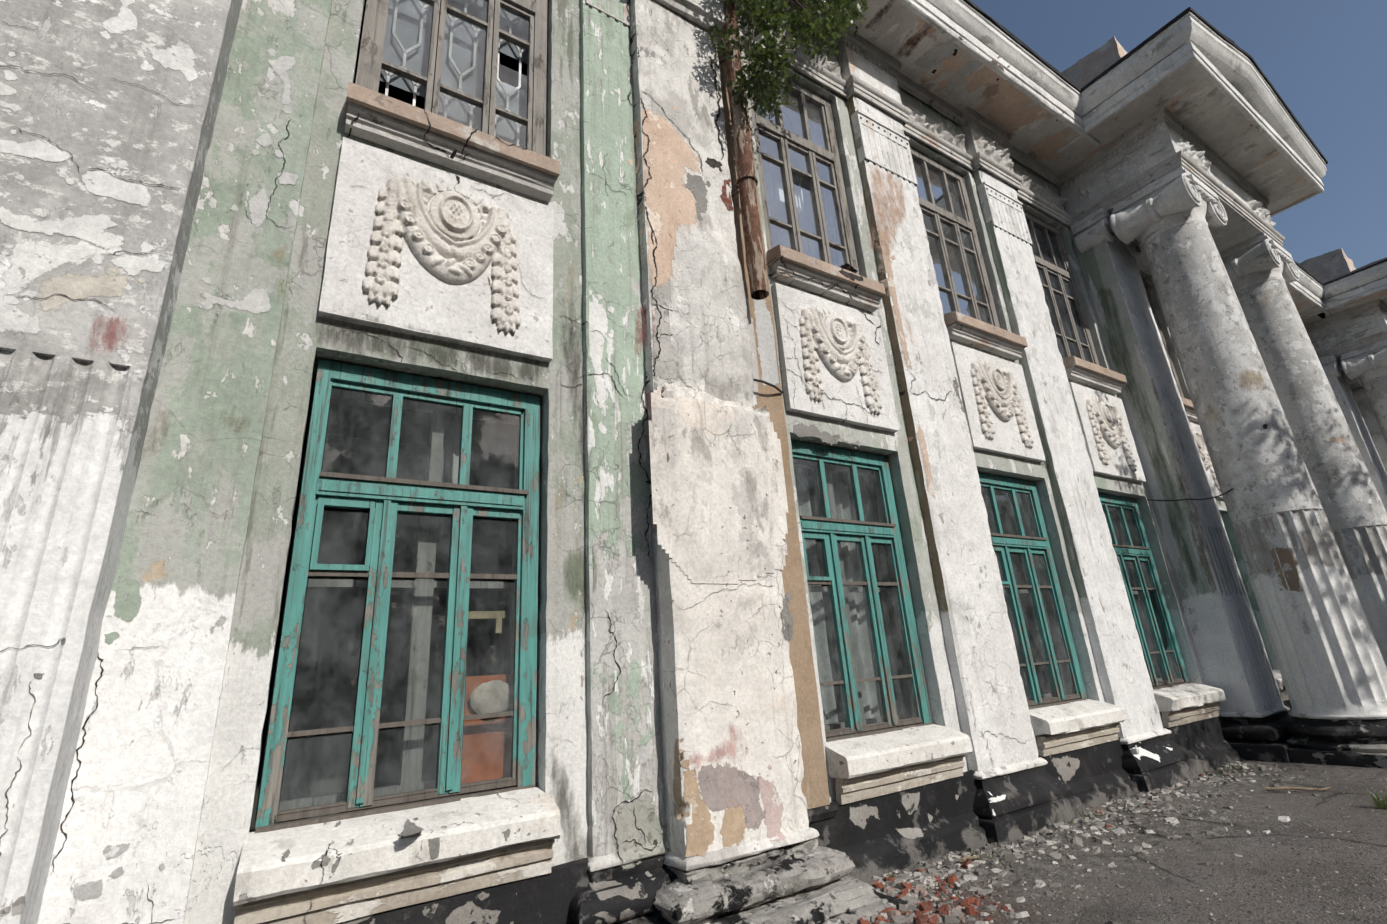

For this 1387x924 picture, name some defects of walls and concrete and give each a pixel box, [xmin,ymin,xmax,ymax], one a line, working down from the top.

peeling [0,129,151,207]
peeling [0,206,166,336]
crack [484,0,724,559]
peeling [624,105,733,467]
peeling [105,576,141,644]
crack [602,611,621,709]
crack [0,637,65,856]
crack [52,645,167,872]
crack [612,789,657,867]
peeling [589,738,785,924]
crack [122,879,181,924]
flaking render [422,892,514,924]